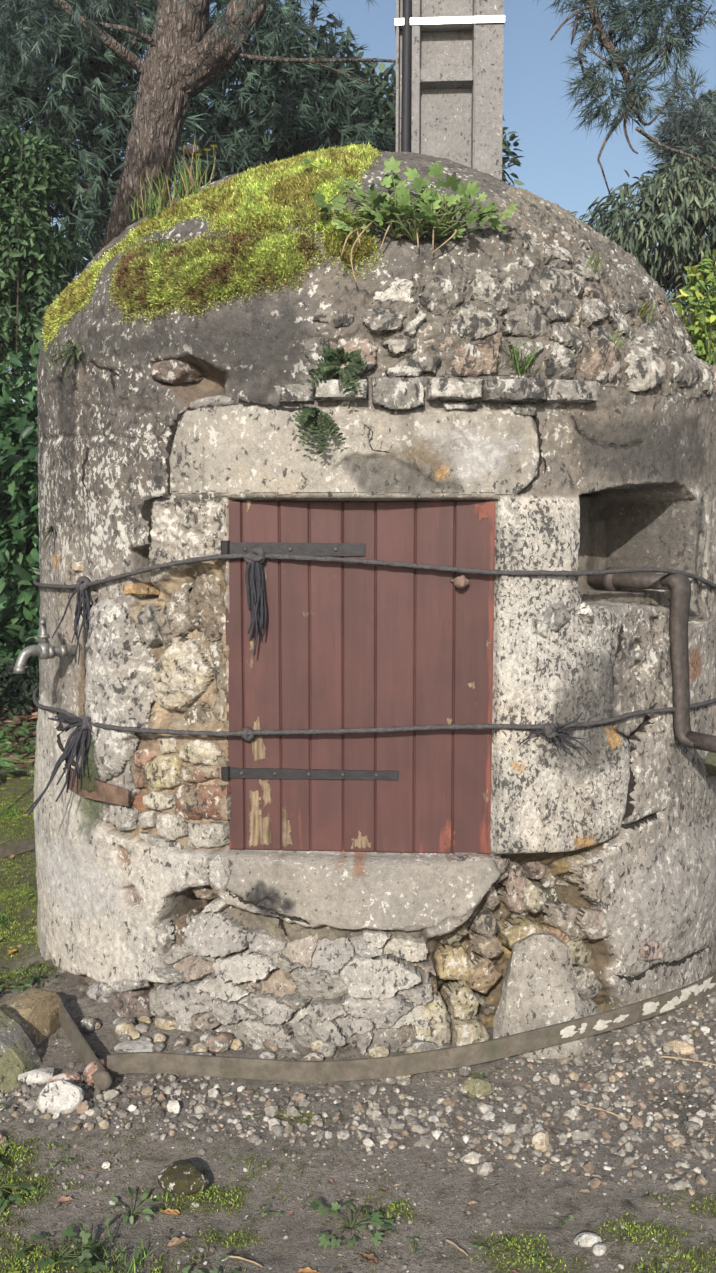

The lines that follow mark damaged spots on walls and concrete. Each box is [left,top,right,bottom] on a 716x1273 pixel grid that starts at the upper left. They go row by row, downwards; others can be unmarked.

crack [141,407,196,543]
crack [239,398,308,412]
crack [517,417,547,495]
crack [572,416,642,449]
crack [612,624,624,678]
spalling [57,556,716,1056]
crack [612,715,657,830]